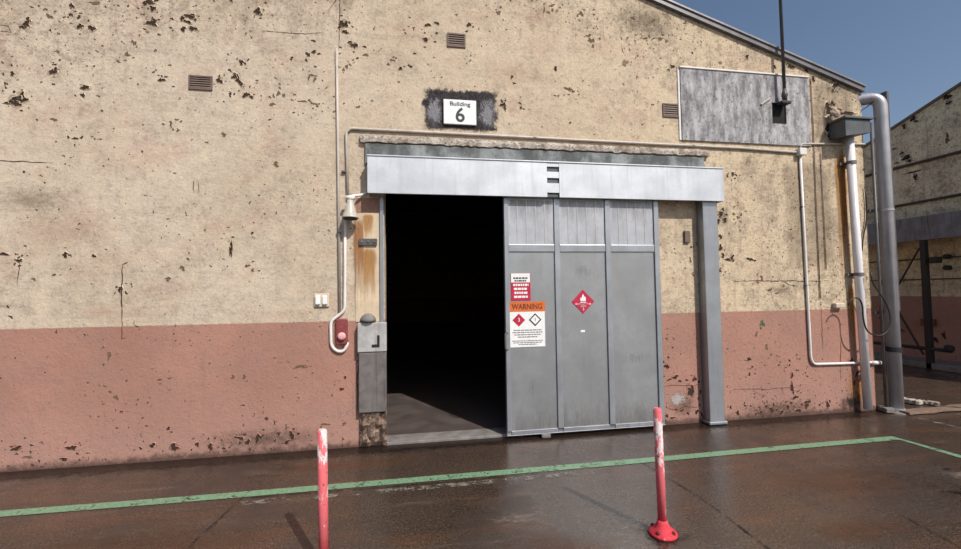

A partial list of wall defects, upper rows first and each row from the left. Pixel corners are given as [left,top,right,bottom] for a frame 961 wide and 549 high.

peeling [14,2,98,35]
peeling [138,0,210,35]
peeling [2,64,33,112]
flaking render [822,81,858,142]
rust [836,157,847,246]
rust [354,215,375,279]
peeling [663,337,703,419]
peeling [730,319,837,416]